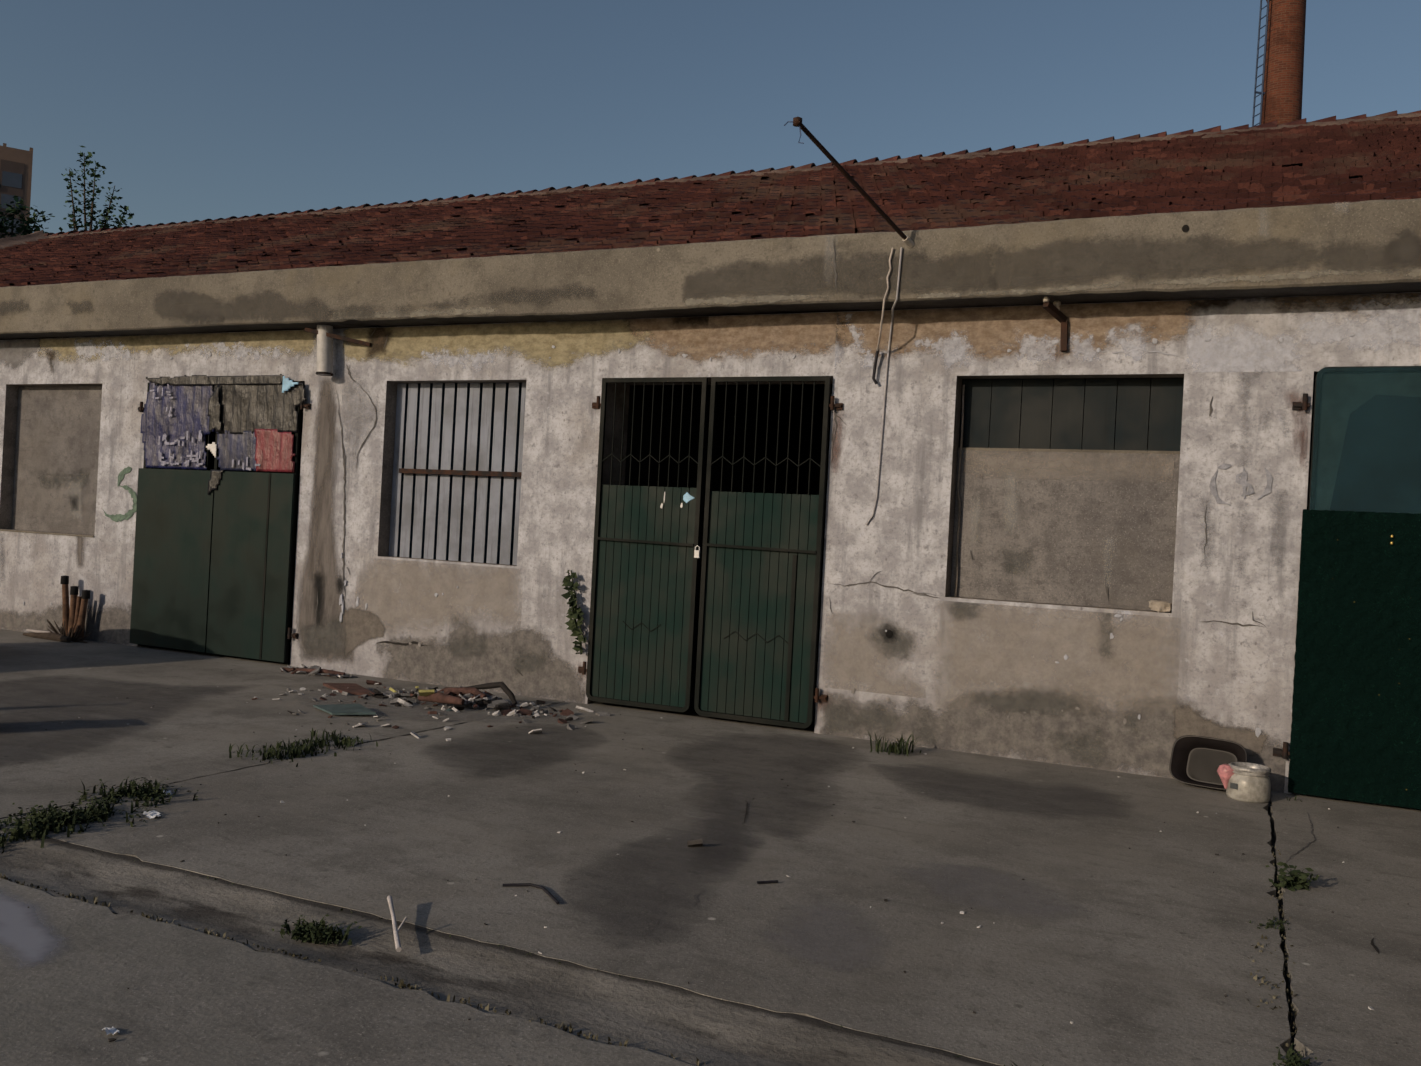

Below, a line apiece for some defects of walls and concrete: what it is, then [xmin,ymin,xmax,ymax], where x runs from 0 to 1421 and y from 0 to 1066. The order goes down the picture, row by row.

water stain [684,234,1421,310]
water stain [846,315,874,367]
water stain [1187,310,1421,372]
crack [829,571,939,612]
peeling [821,602,1286,793]